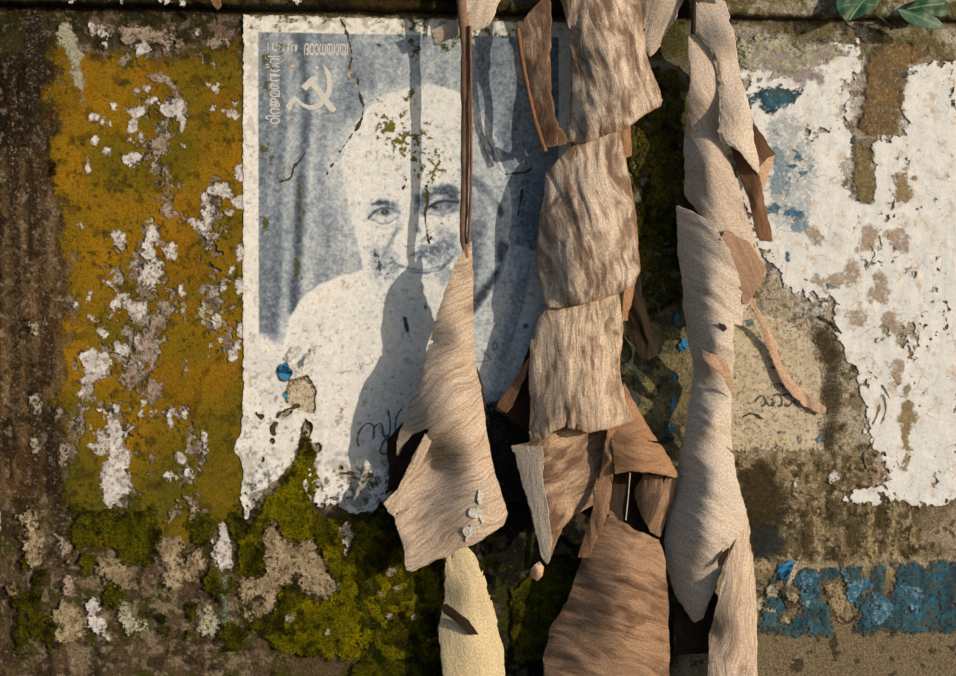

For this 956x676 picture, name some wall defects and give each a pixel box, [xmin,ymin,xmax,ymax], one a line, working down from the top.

flaking render [86,22,231,69]
peeling [88,71,244,250]
peeling [735,31,956,507]
peeling [72,224,246,509]
flaking render [57,443,72,467]
leakage [220,577,230,626]
peeling [753,557,956,638]